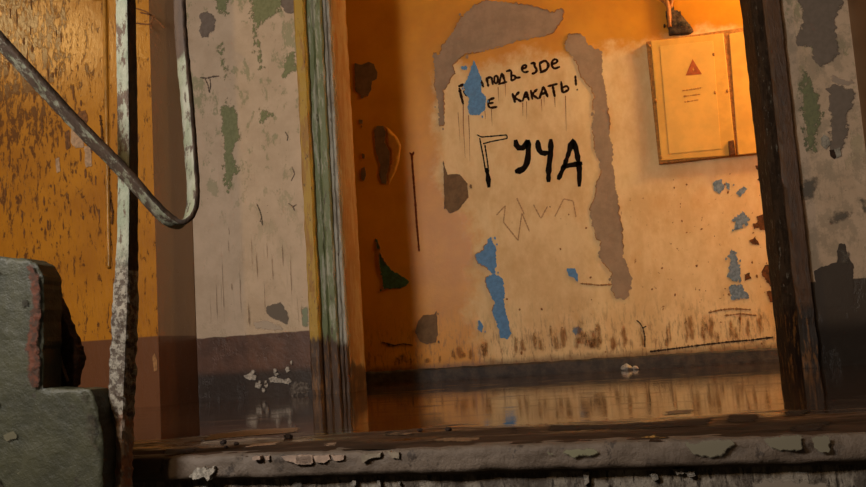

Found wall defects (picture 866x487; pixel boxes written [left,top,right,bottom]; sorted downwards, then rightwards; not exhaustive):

peeling [199,0,229,38]
peeling [248,0,294,70]
peeling [432,0,565,130]
peeling [796,0,844,67]
peeling [221,98,240,193]
peeling [443,161,472,214]
peeling [564,33,633,300]
peeling [799,71,856,159]
spalling [22,265,41,388]
peeling [475,237,512,339]
peeling [723,249,753,300]
peeling [548,409,710,438]